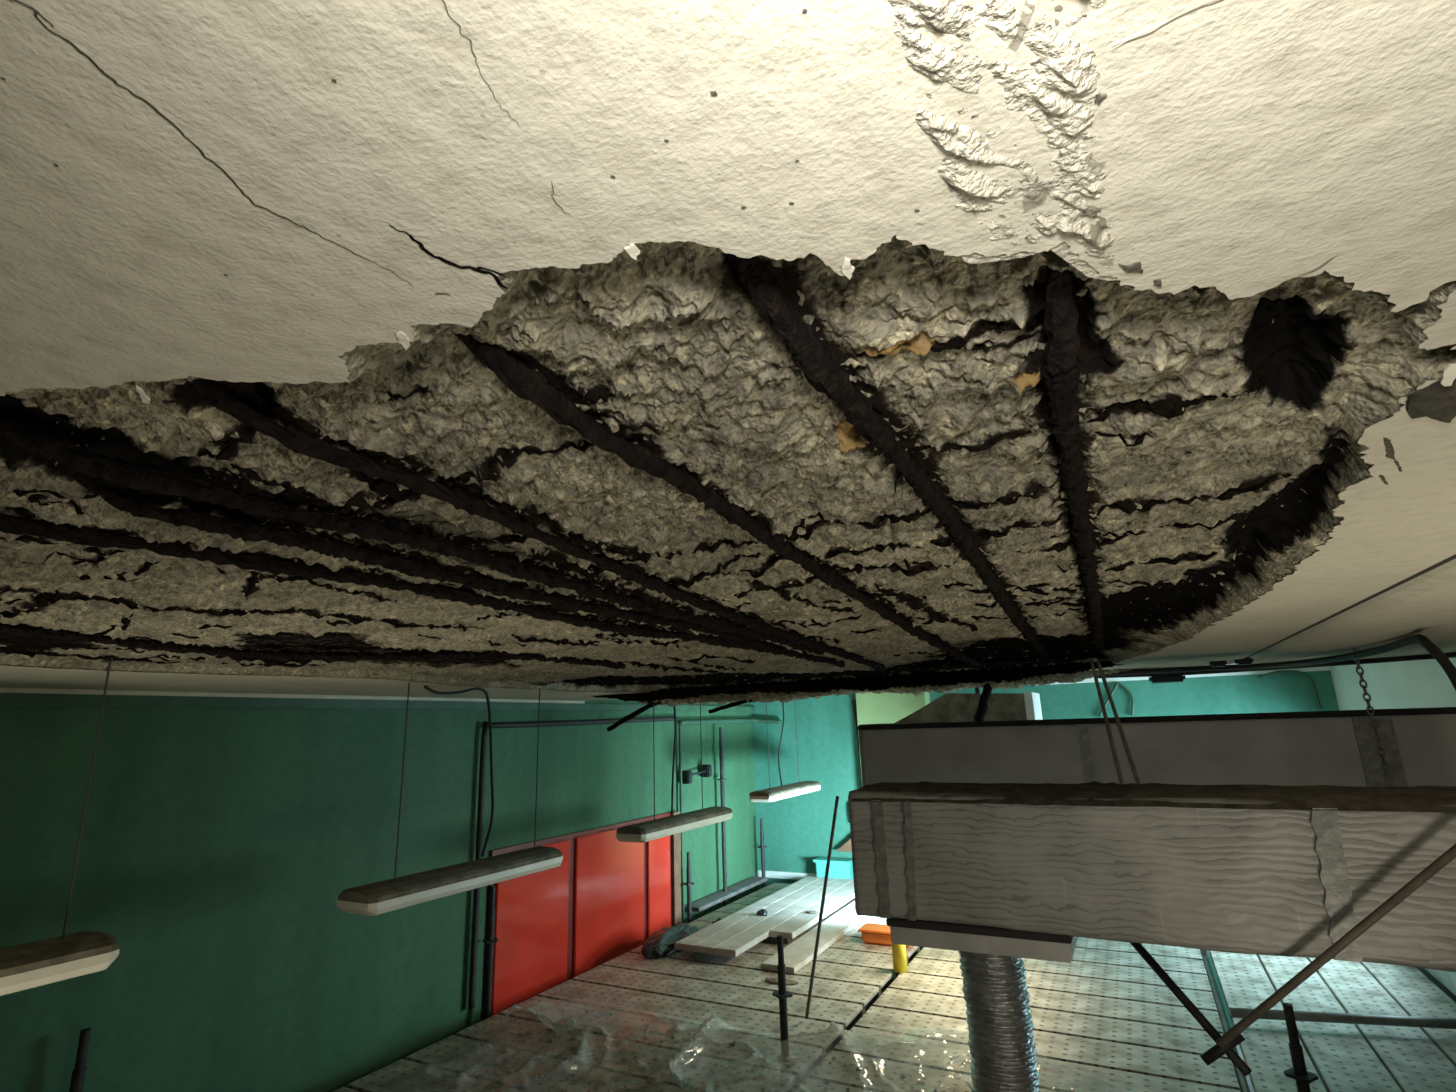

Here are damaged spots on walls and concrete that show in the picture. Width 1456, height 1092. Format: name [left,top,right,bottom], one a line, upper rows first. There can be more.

crack [10,0,519,295]
spalling [0,206,1456,732]